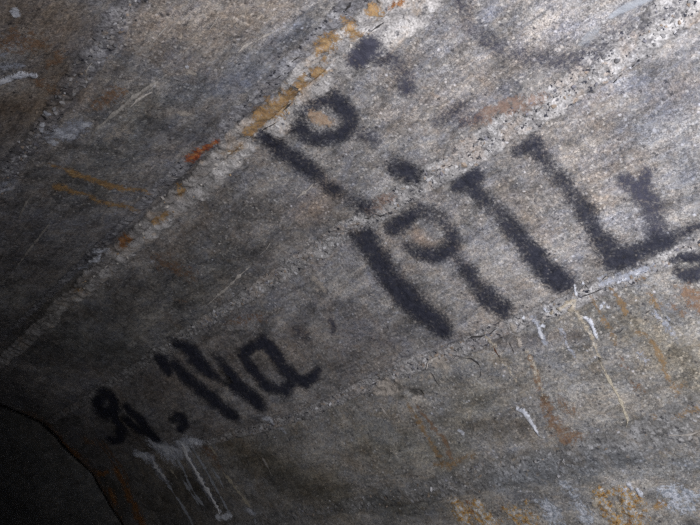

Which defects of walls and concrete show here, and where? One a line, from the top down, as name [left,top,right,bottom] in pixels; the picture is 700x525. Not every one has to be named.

corrosion [364,0,404,17]
corrosion [242,15,363,136]
damp [133,435,256,525]